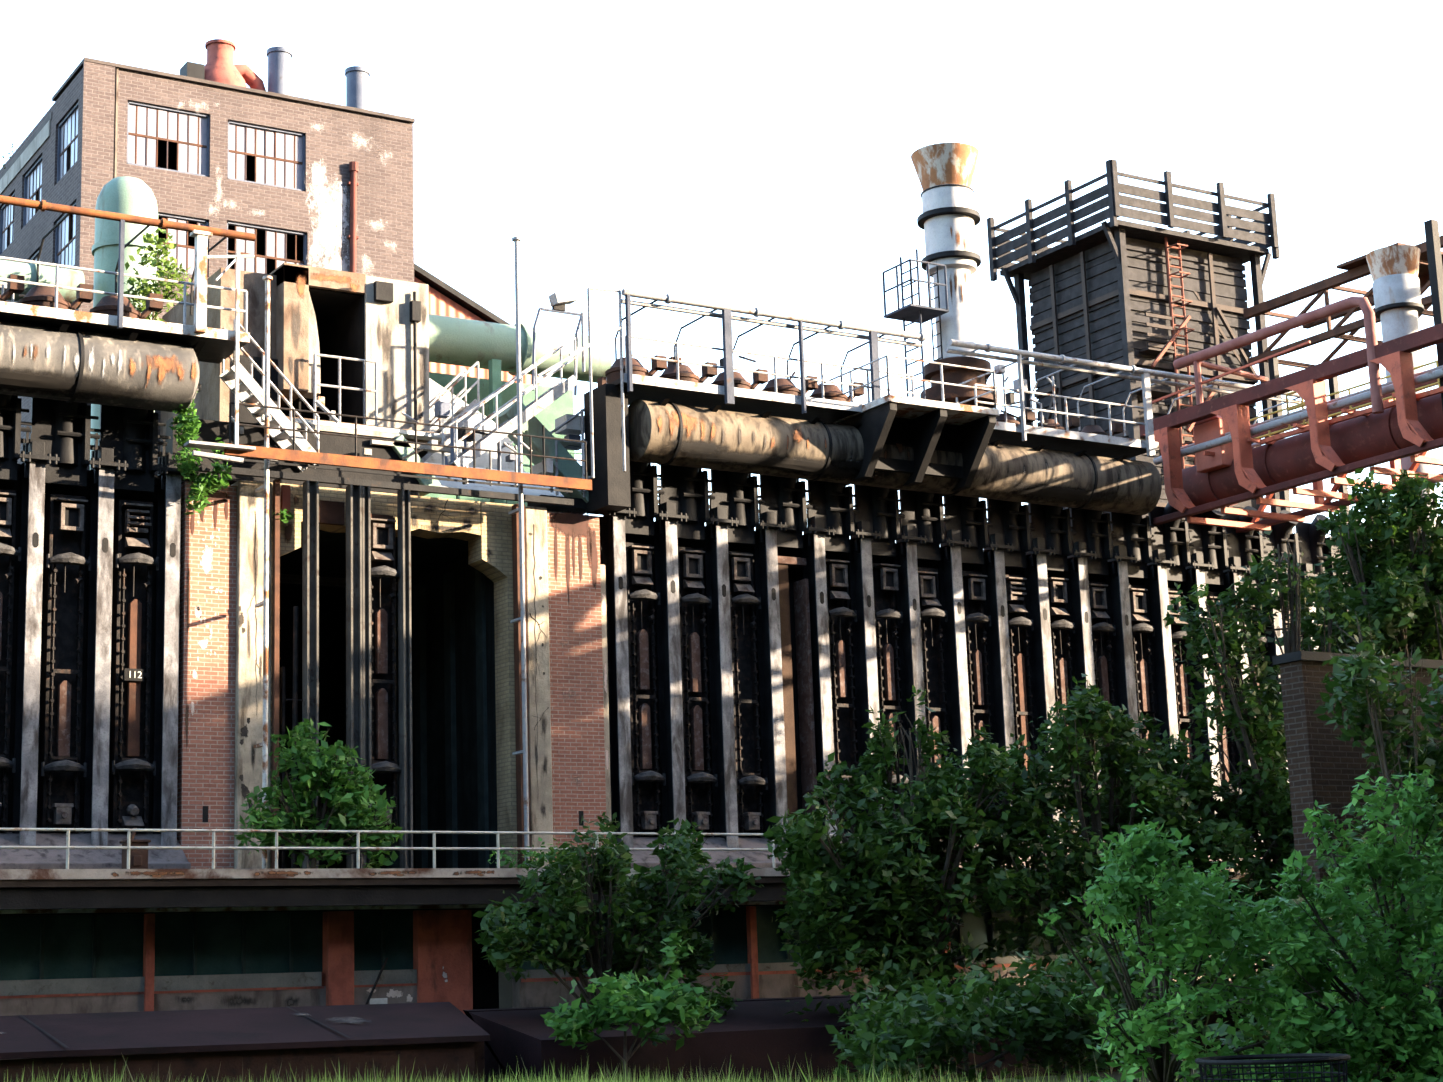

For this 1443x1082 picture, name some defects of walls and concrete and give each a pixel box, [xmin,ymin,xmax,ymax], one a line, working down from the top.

corrosion [130,355,197,388]
corrosion [657,410,716,441]
corrosion [771,428,827,450]
spalling [193,521,223,679]